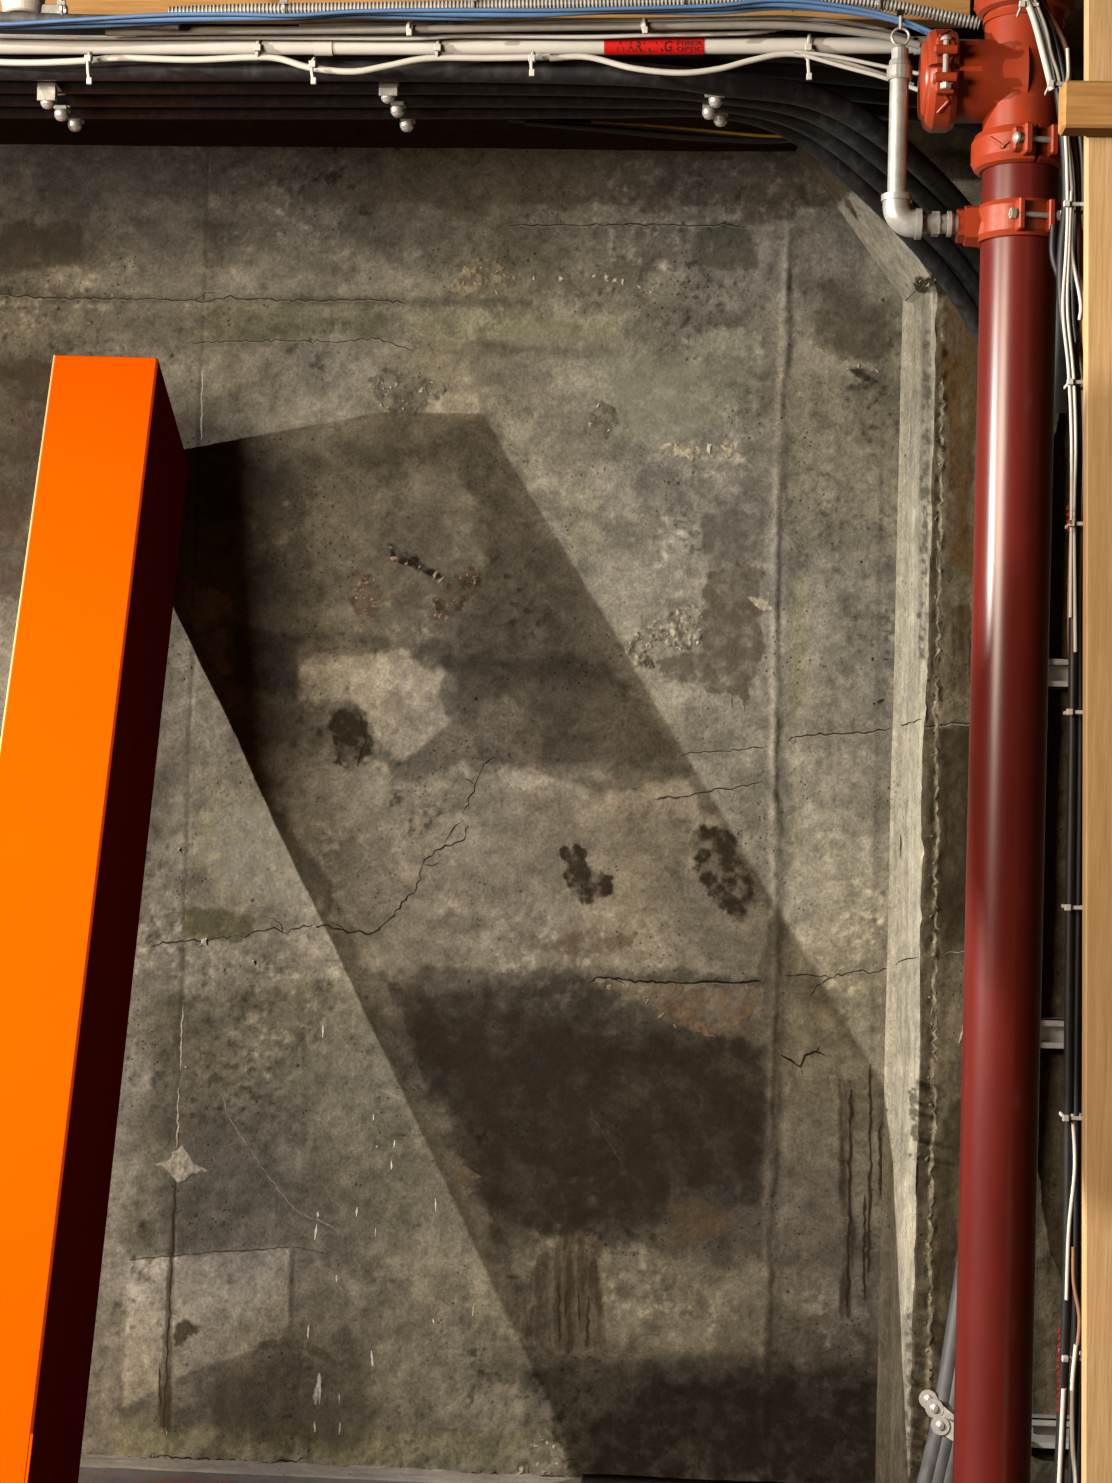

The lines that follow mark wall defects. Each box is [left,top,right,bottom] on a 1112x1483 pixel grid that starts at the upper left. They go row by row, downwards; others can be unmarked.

spalling [623,604,704,668]
water stain [329,709,372,767]
crack [656,719,970,800]
crack [151,757,495,947]
water stain [560,844,613,904]
water stain [694,824,753,916]